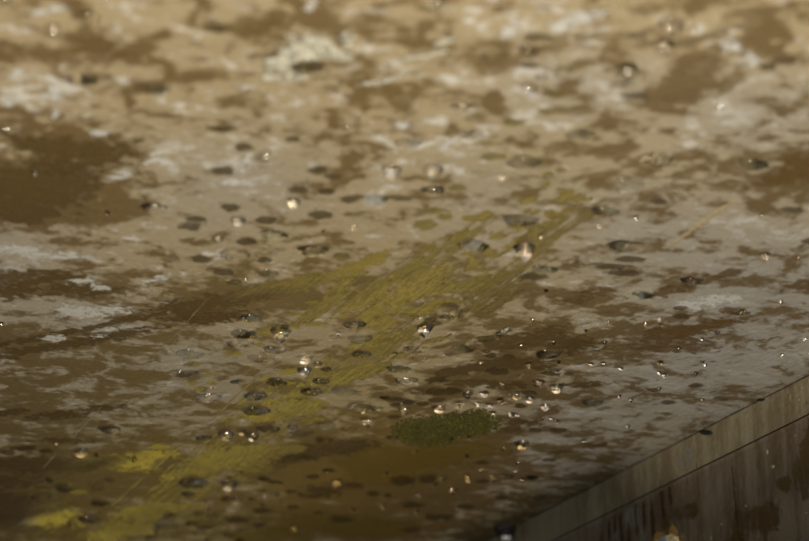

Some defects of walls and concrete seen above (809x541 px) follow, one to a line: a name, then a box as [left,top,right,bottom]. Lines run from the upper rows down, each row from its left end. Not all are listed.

damp [0,130,164,226]
damp [212,143,253,186]
damp [0,166,615,541]
spalling [411,310,467,326]